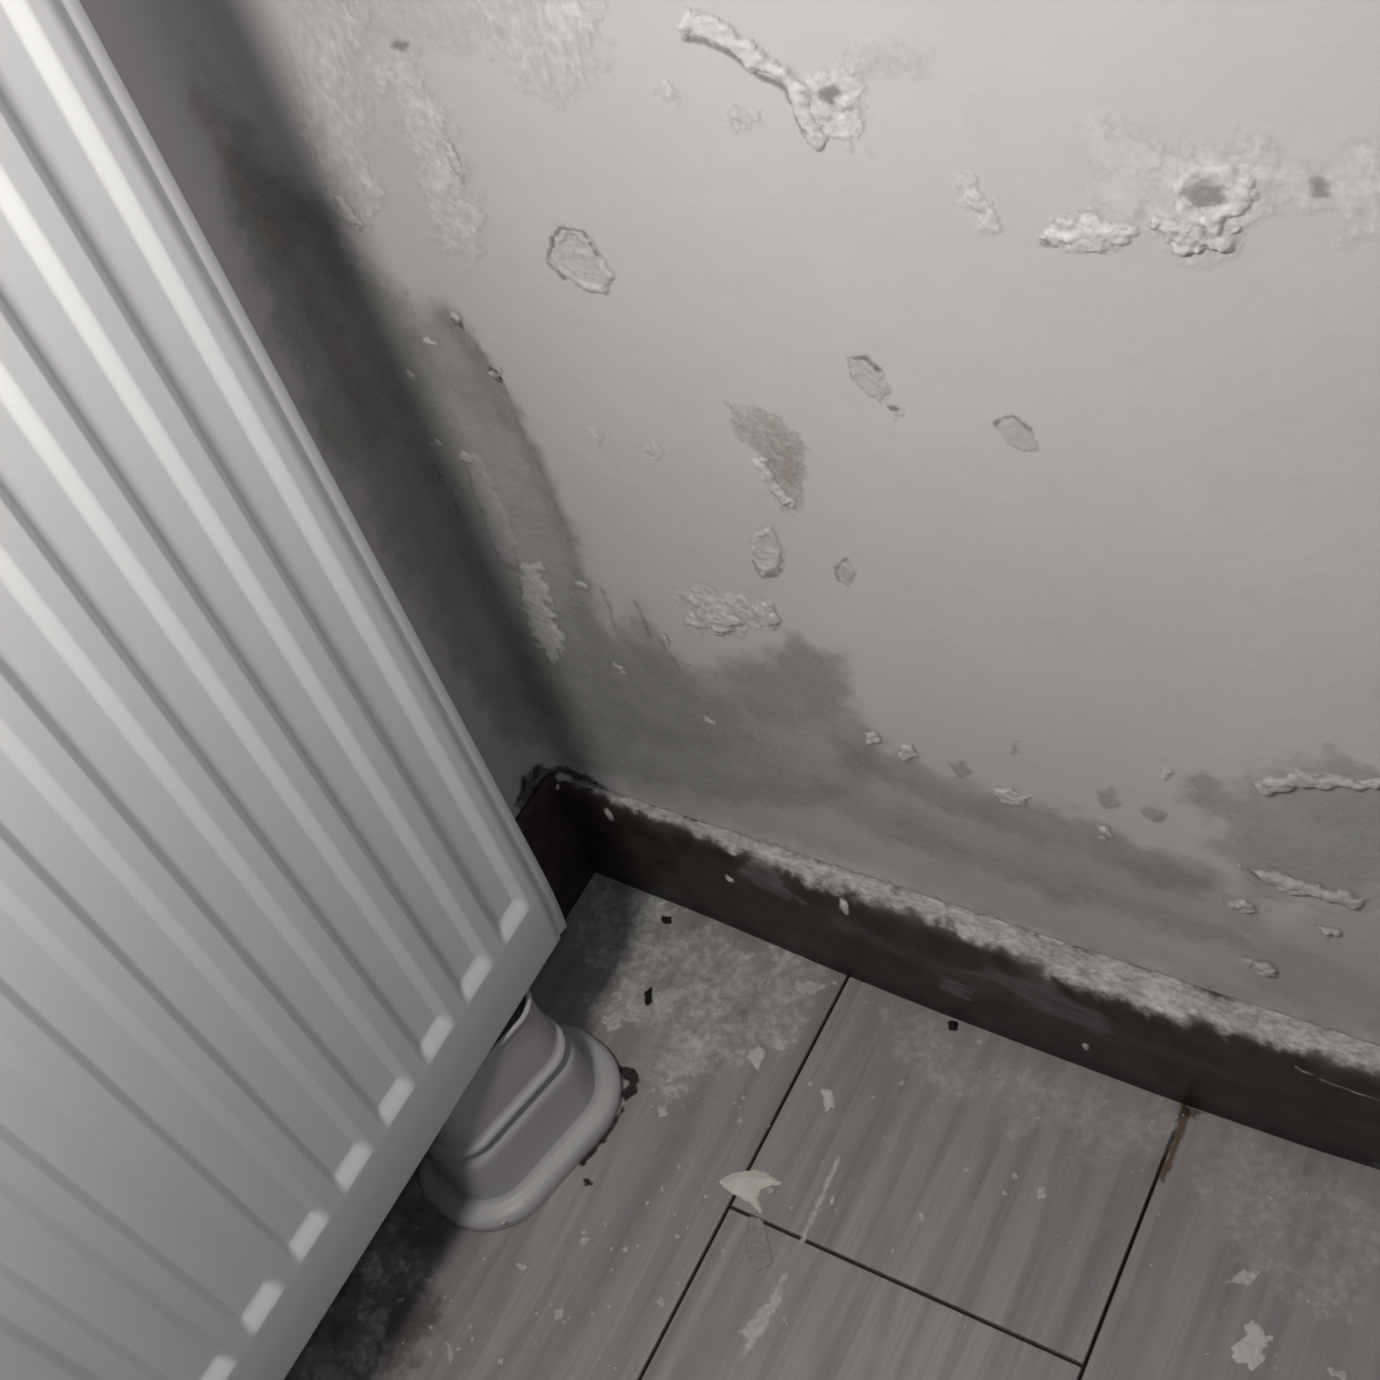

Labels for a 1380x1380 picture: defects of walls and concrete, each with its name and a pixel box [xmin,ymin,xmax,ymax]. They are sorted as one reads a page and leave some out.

peeling [675,9,865,152]
leakage [458,450,589,664]
leakage [515,765,604,808]
peeling [1254,768,1380,796]
peeling [1237,864,1368,910]
peeling [652,986,686,1013]
peeling [795,979,837,995]
peeling [601,1009,625,1032]
peeling [746,1044,766,1070]